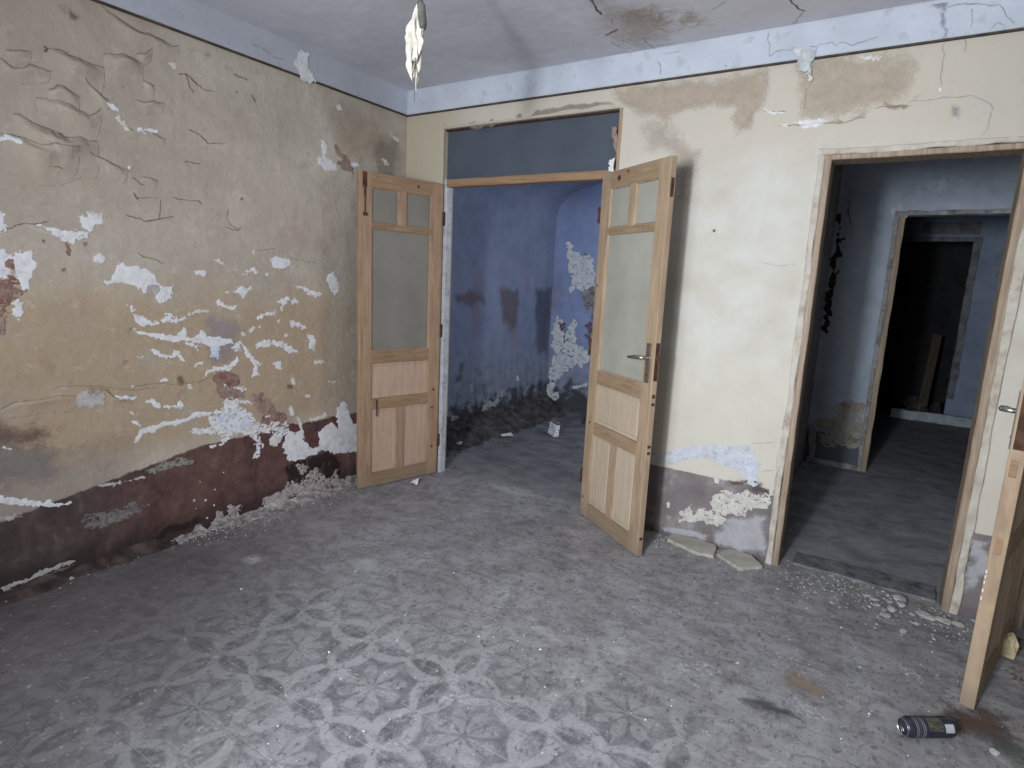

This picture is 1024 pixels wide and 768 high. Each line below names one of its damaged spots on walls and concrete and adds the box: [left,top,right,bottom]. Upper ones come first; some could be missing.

crack [180,73,255,101]
leakage [618,72,767,128]
leakage [803,55,909,116]
crack [762,3,1014,136]
crack [127,194,201,222]
spalling [0,249,37,335]
spalling [547,241,596,401]
spalling [94,250,357,462]
leakage [190,404,290,458]
peeling [0,495,72,521]
leakage [285,453,344,491]
peeling [650,443,774,527]